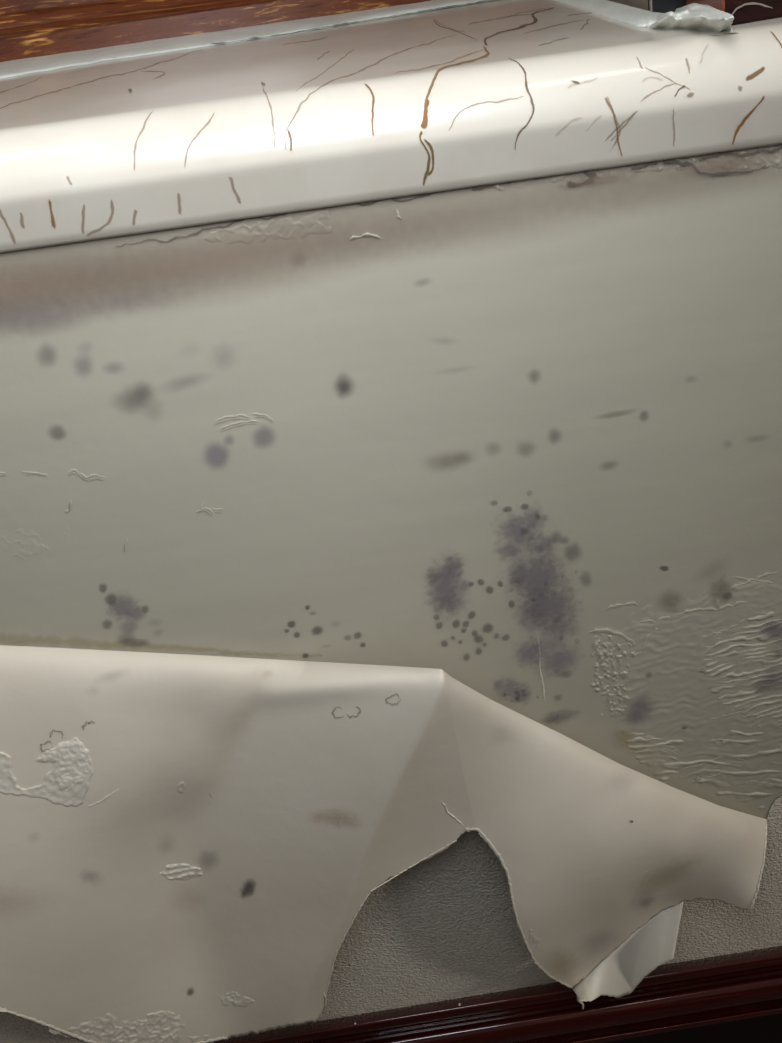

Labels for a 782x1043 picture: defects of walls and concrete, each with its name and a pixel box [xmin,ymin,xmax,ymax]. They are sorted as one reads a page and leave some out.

crack [211,0,554,185]
crack [605,98,622,155]
crack [732,67,765,145]
peeling [588,571,780,717]
peeling [0,645,767,1043]